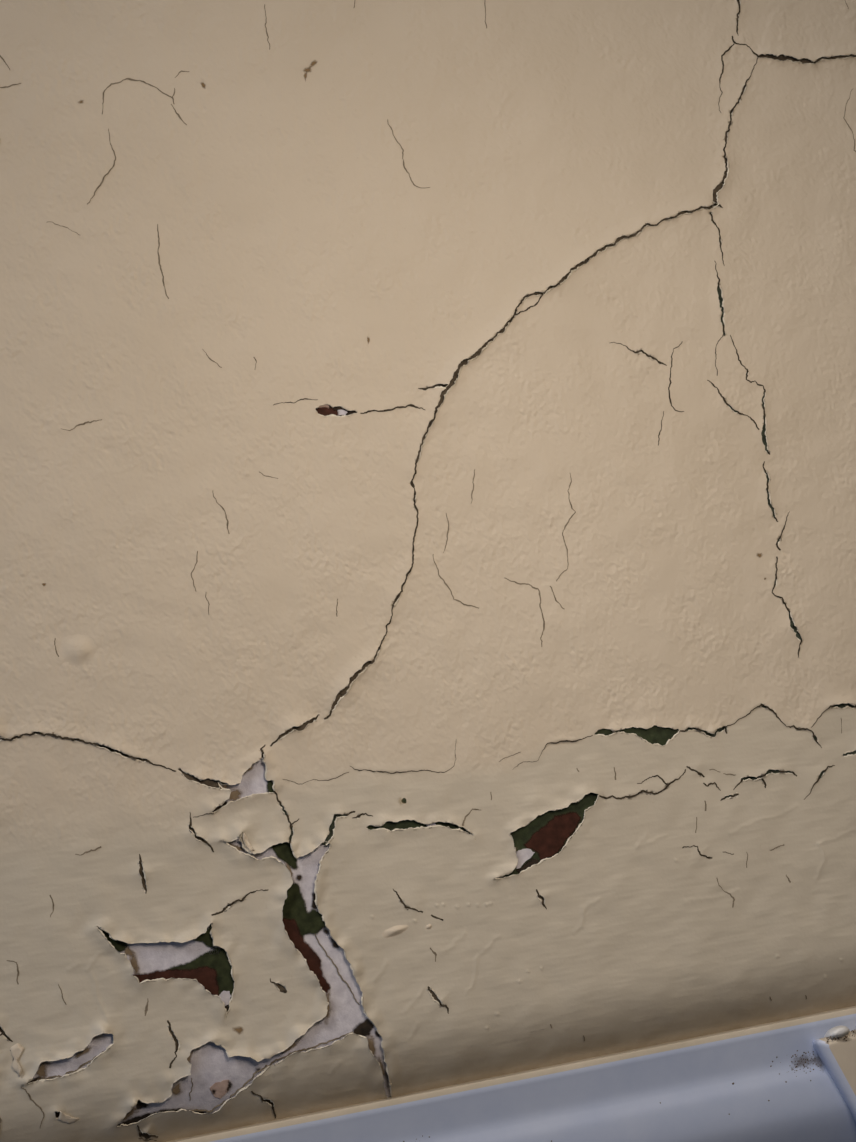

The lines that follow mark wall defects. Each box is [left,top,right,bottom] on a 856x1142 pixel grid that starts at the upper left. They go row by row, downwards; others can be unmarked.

crack [87,71,190,204]
crack [157,224,169,299]
peeling [316,404,358,417]
crack [259,0,856,758]
crack [213,493,230,534]
crack [191,551,210,614]
peeling [595,724,680,746]
crack [274,744,456,847]
peeling [495,792,599,879]
peeling [96,923,235,1019]
peeling [117,833,392,1127]
peeling [10,1033,114,1084]